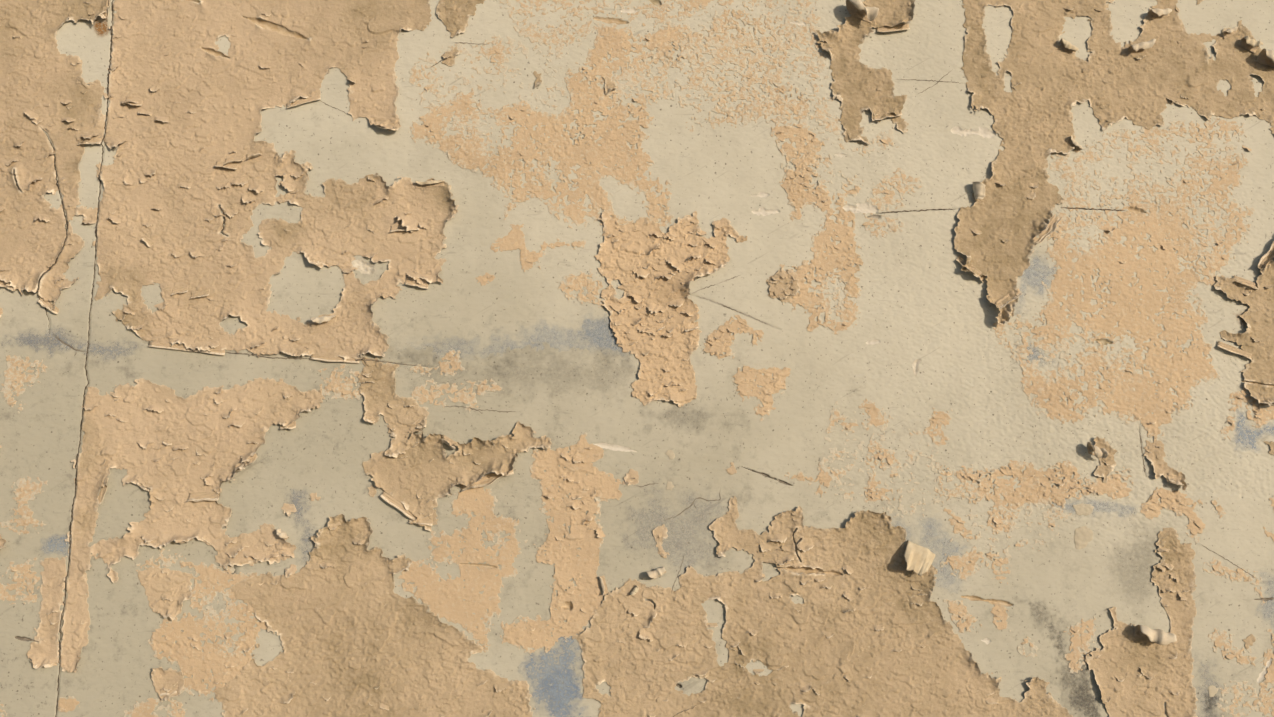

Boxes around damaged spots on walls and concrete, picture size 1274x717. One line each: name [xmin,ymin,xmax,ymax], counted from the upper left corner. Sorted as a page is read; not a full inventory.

peeling [0,355,48,414]
crack [37,1,113,717]
peeling [0,0,459,363]
peeling [15,356,1073,717]
peeling [402,0,923,407]
peeling [933,0,1274,717]